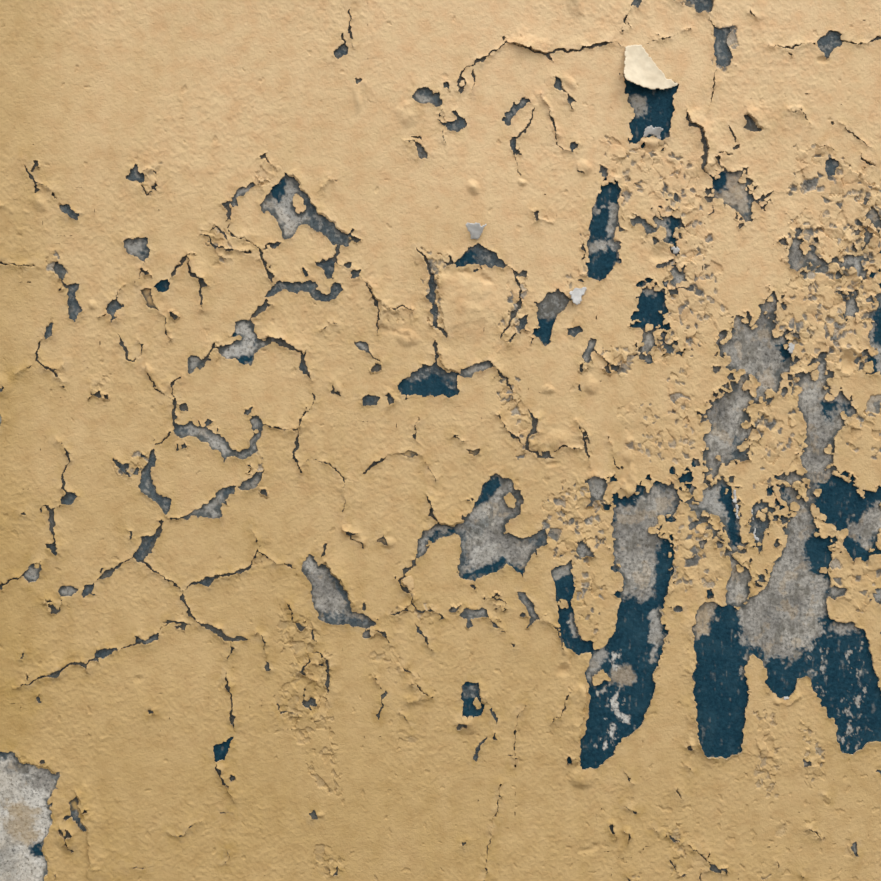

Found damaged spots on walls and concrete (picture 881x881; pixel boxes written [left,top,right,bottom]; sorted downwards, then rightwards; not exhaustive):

crack [447,36,621,98]
peeling [671,0,738,102]
crack [0,253,82,388]
peeling [99,237,208,341]
crack [164,343,219,426]
peeling [218,319,269,366]
peeling [198,153,361,302]
crack [227,225,436,537]
peeling [252,25,881,802]
crack [21,438,77,559]
crack [11,516,296,789]
peeling [0,751,87,881]